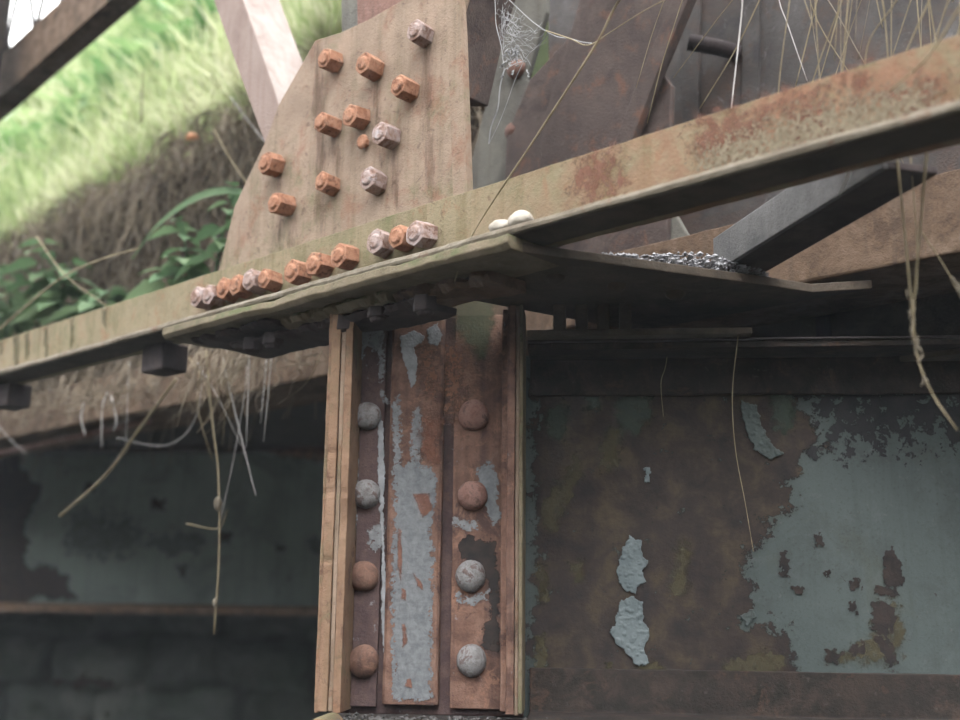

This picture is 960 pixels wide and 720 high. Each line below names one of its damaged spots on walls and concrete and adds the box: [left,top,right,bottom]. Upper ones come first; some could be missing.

rust [685,58,959,164]
rust [565,141,631,204]
peeling [400,323,442,388]
peeling [355,330,438,702]
peeling [455,588,490,606]
peeling [451,460,501,532]
rust [458,534,501,653]
peeling [525,377,960,672]
rust [778,550,805,595]
rust [818,546,907,668]